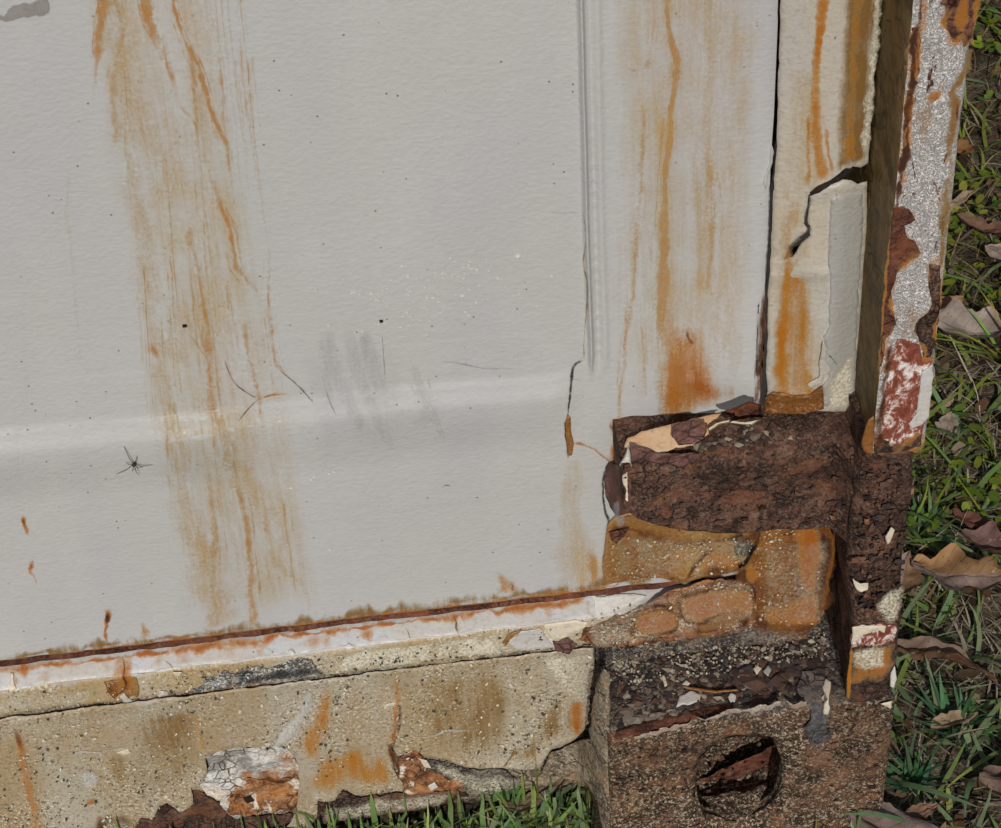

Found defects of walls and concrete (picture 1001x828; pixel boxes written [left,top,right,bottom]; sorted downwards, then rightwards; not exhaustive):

rust [807,0,881,182]
rust [928,0,979,165]
crack [581,244,589,324]
crack [755,145,855,406]
rust [861,2,925,456]
rust [914,178,951,361]
crack [564,361,614,461]
rust [0,555,650,682]
rust [97,790,293,828]
spalling [199,746,299,819]
crack [384,680,400,776]
rust [314,752,521,825]